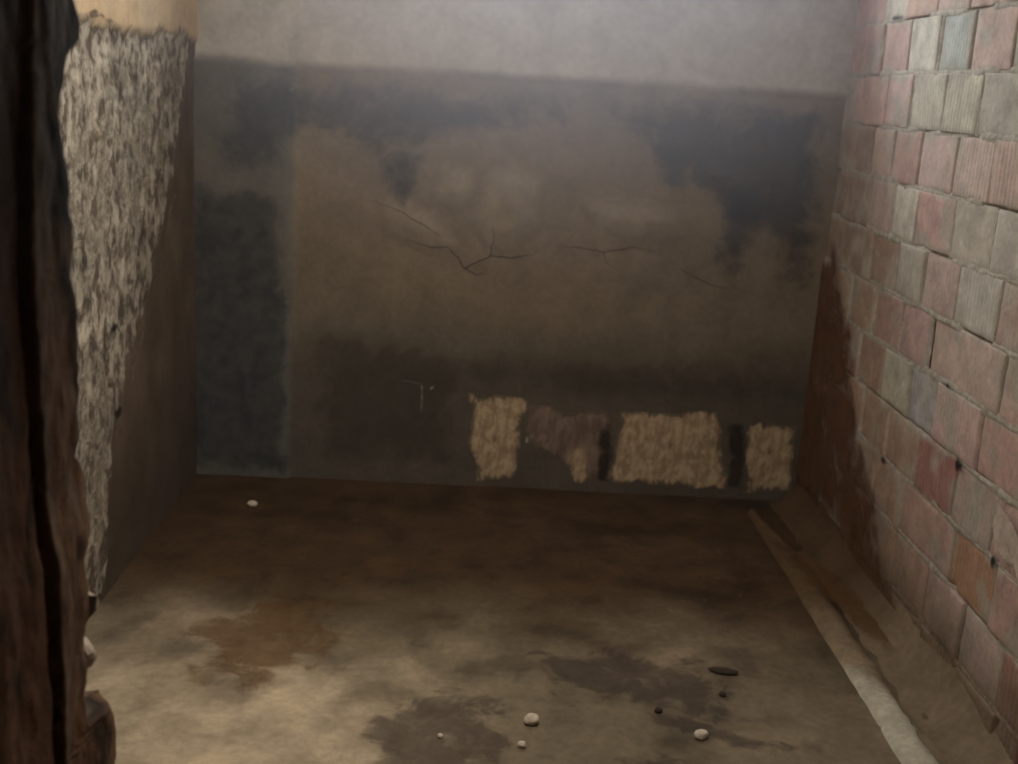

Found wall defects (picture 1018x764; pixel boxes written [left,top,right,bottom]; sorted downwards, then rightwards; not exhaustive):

crack [370,200,533,276]
peeling [468,393,727,489]
peeling [745,423,795,493]